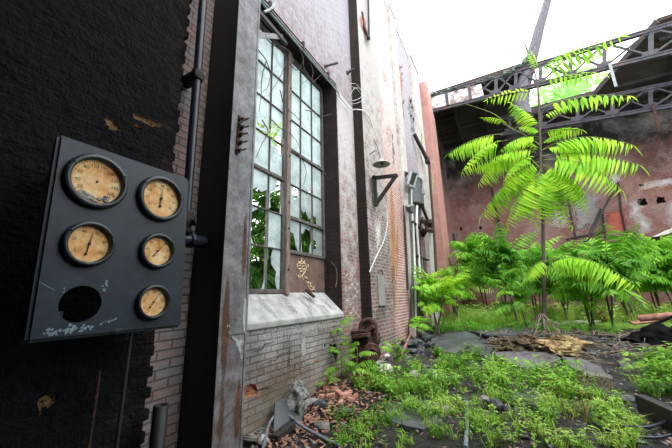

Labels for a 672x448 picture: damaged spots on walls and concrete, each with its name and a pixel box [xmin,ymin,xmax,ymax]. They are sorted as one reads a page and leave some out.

spalling [104,118,121,132]
spalling [133,113,161,129]
peeling [607,210,628,233]
corrosion [222,280,230,371]
spalling [244,384,259,398]
spalling [37,393,60,416]